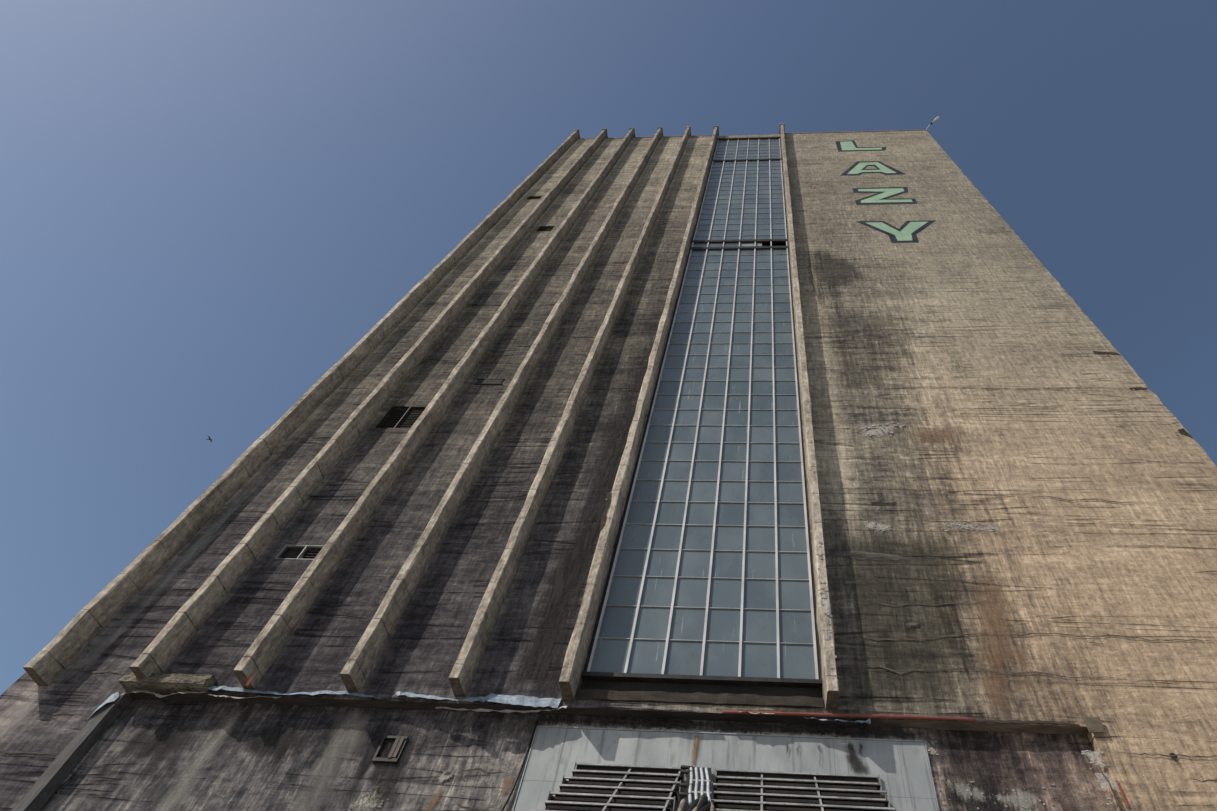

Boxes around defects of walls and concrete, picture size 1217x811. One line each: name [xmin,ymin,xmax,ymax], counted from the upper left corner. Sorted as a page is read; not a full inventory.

damp [944,770,1004,811]
crack [1099,752,1217,811]